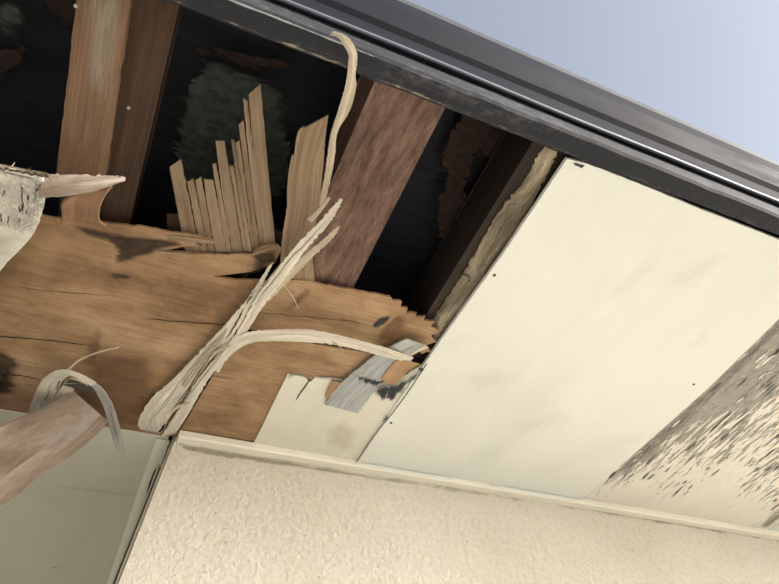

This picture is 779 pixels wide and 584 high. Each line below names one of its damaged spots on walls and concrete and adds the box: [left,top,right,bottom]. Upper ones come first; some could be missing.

crack [0,171,43,229]
water stain [0,354,16,393]
peeling [325,380,341,399]
peeling [595,319,779,528]